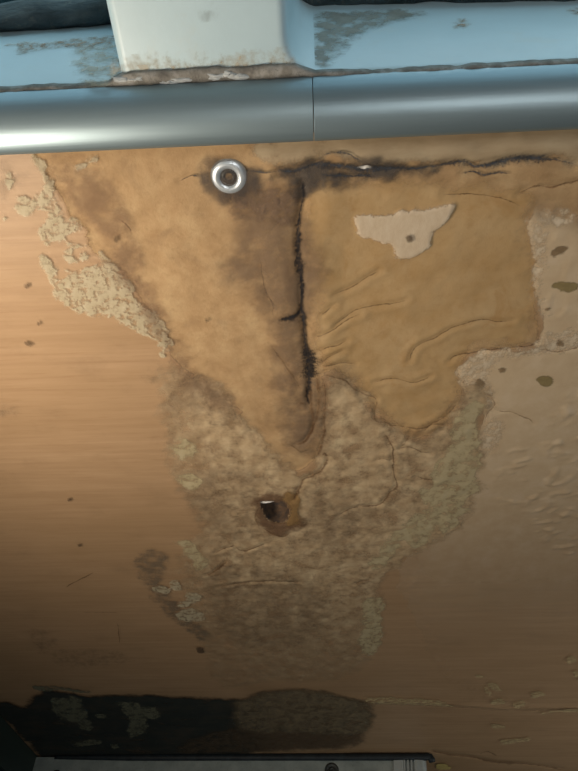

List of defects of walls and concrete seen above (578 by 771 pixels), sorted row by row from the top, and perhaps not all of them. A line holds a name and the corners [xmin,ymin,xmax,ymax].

peeling [14,154,174,358]
damp [200,158,436,448]
peeling [354,204,456,260]
crack [246,151,576,499]
peeling [530,209,573,289]
peeling [552,282,578,293]
peeling [536,376,553,387]
damp [0,686,371,757]